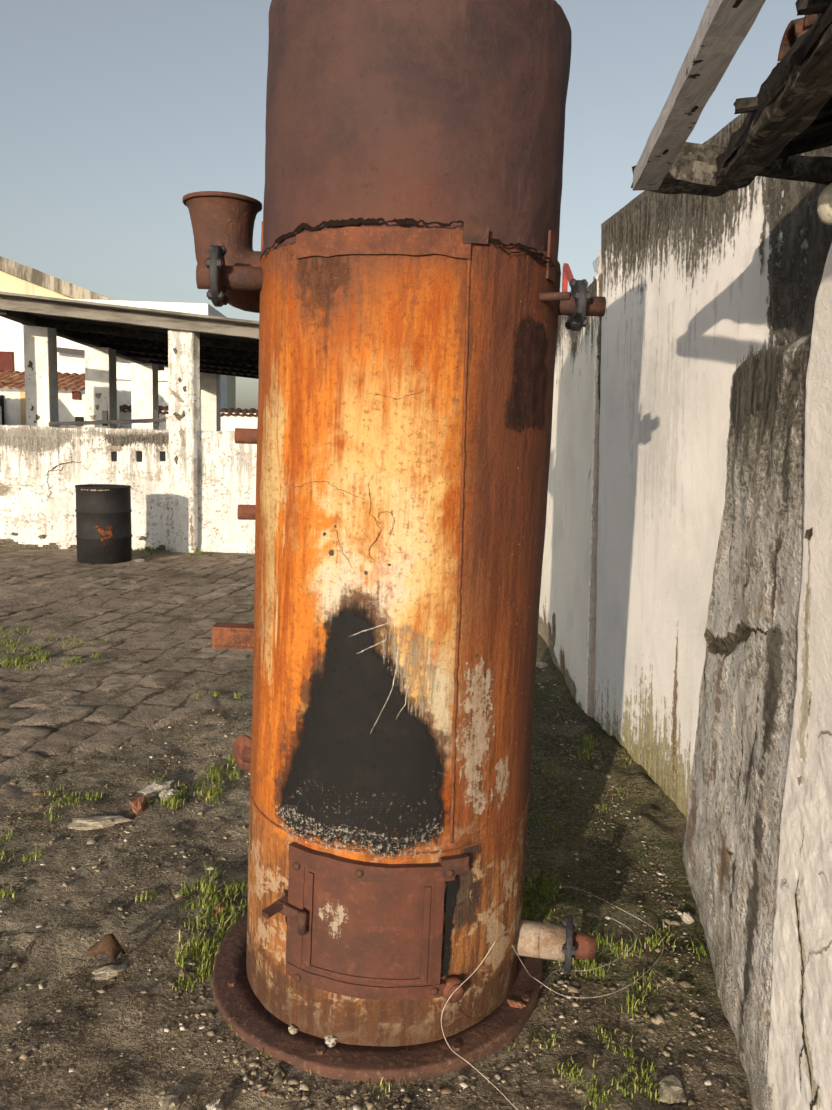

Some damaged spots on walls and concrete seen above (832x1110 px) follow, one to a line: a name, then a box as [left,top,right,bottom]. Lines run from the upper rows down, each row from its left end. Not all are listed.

water stain [703,113,748,147]
water stain [798,146,832,157]
water stain [0,426,169,473]
water stain [555,176,832,1055]